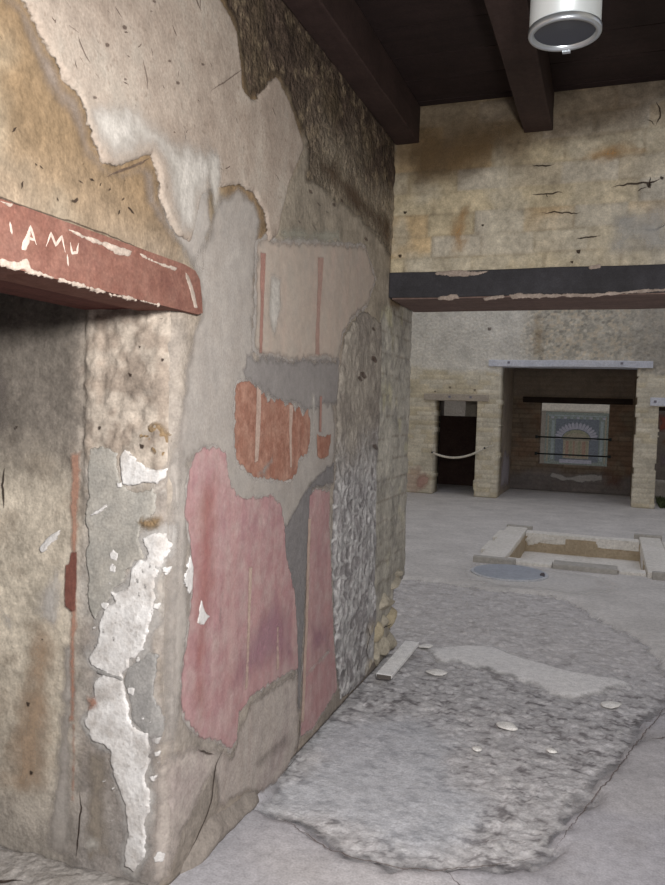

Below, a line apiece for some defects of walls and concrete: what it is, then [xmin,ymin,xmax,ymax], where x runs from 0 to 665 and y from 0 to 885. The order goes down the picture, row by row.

peeling [22,0,407,270]
crack [614,177,659,191]
peeling [0,259,160,307]
peeling [69,229,198,308]
peeling [483,289,665,301]
crack [0,468,8,504]
peeling [117,423,170,487]
peeling [80,518,299,882]
crack [562,709,664,839]
crack [272,813,538,885]